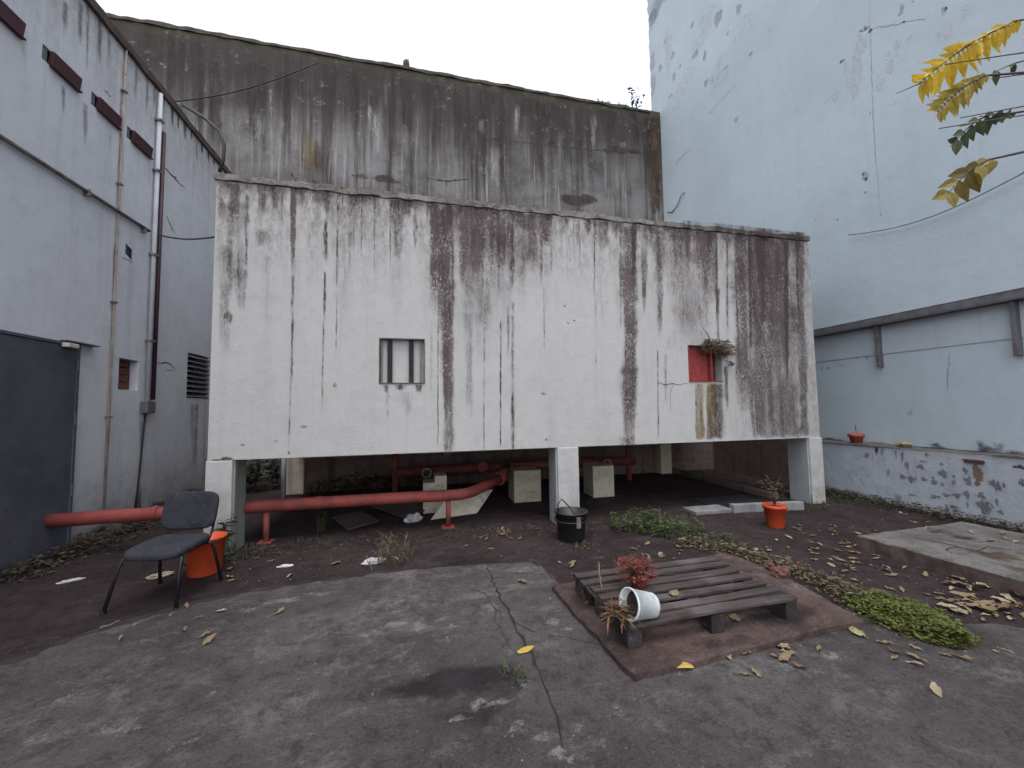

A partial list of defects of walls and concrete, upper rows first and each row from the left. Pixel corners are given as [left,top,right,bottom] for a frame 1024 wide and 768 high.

water stain [219,184,305,276]
water stain [321,191,375,312]
water stain [355,174,398,183]
water stain [562,194,597,206]
water stain [390,200,809,484]
corrosion [695,367,728,439]
peeling [900,461,1024,515]
crack [0,563,601,763]